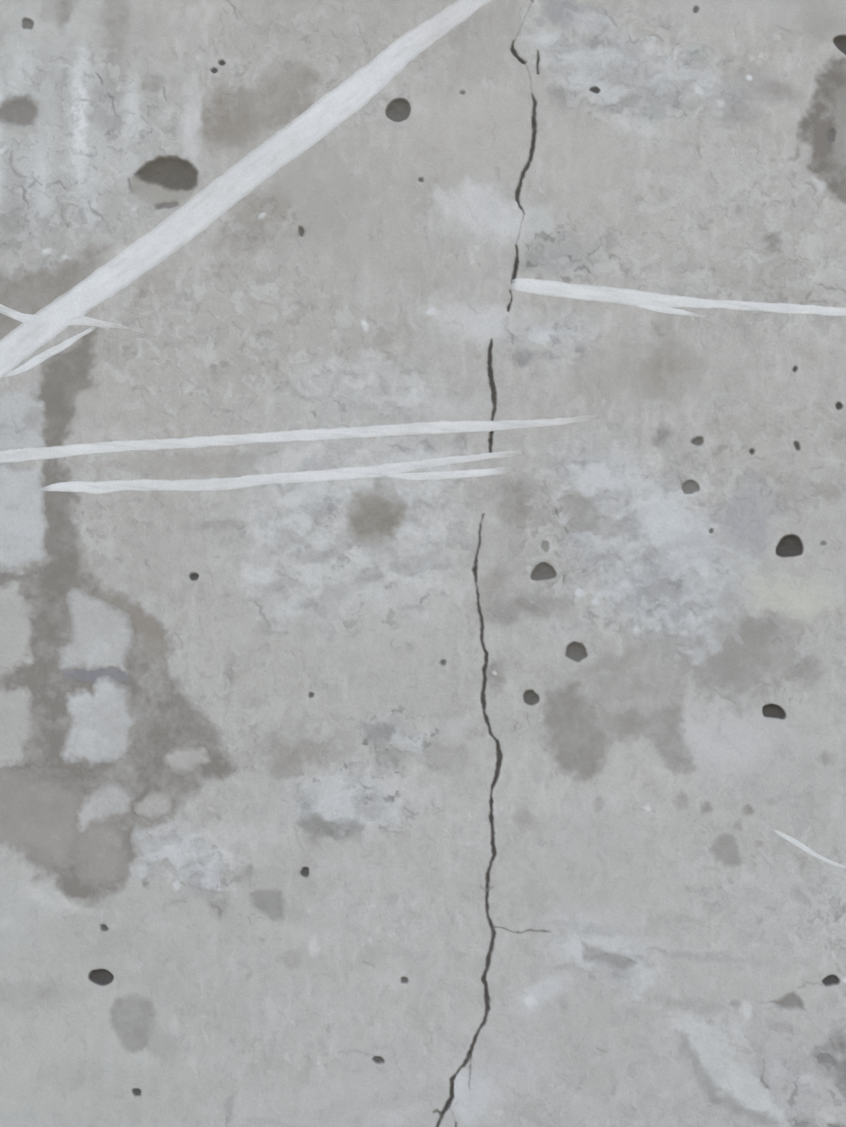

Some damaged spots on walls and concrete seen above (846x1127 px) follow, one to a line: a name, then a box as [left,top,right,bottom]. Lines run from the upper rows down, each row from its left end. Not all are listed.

crack [506,0,541,312]
damp [791,52,846,208]
crack [486,338,498,453]
damp [0,326,242,911]
crack [431,513,552,1127]